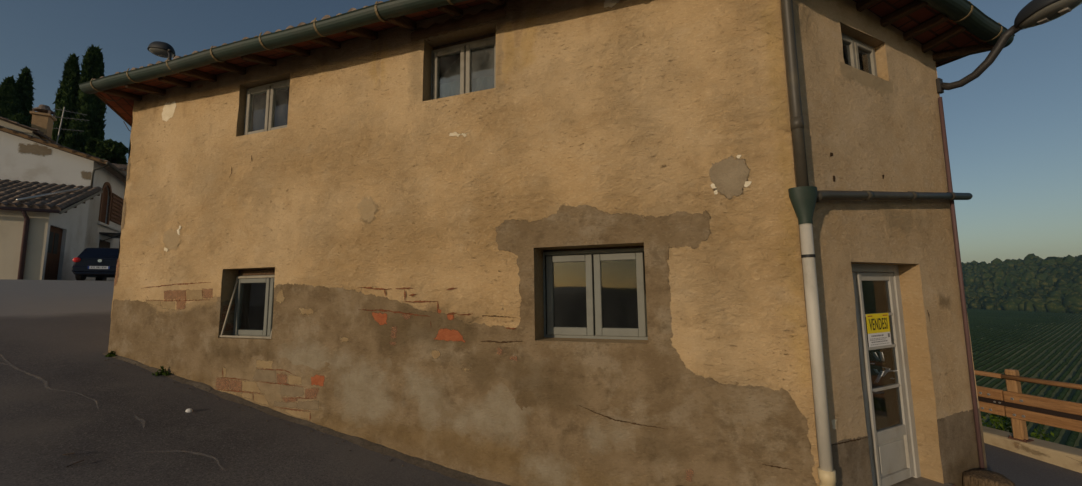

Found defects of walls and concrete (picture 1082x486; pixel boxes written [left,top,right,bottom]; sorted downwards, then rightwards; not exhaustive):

spalling [160,100,178,125]
flaking render [108,198,819,486]
crack [581,406,664,429]
flaking render [829,414,873,486]